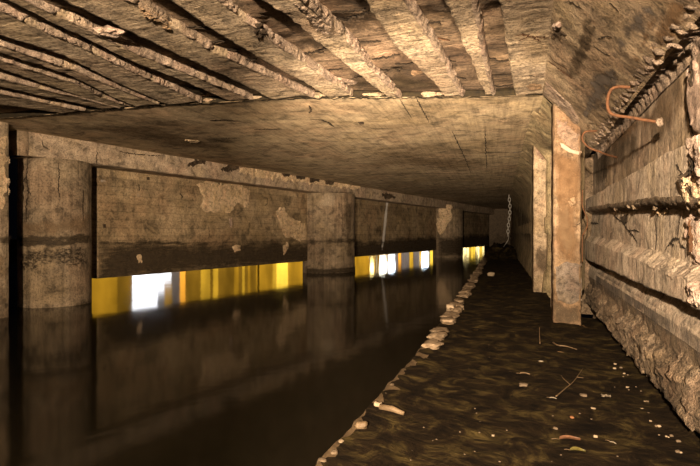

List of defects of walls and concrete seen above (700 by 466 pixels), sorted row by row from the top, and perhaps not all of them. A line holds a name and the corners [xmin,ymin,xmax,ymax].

spalling [0,0,262,111]
spalling [125,0,327,99]
spalling [244,13,358,97]
spalling [292,0,402,98]
spalling [404,0,465,97]
peeling [676,22,698,34]
peeling [197,181,250,228]
water stain [100,240,355,278]
spalling [276,207,306,255]
spalling [436,205,452,235]
spalling [544,58,700,307]
crack [615,214,693,258]